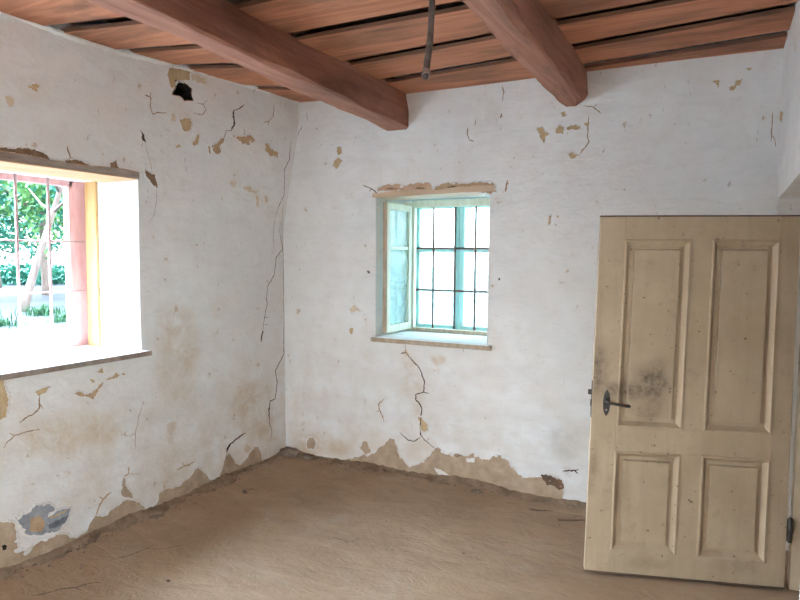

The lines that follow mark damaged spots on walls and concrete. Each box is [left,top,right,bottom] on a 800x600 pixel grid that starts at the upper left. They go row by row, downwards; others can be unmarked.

flaking render [166,64,208,102]
flaking render [170,112,279,159]
crack [578,104,600,156]
flaking render [375,180,497,195]
crack [261,128,302,341]
crack [5,395,43,446]
water stain [5,398,132,490]
flaking render [0,444,264,568]
water stain [147,290,210,449]
crack [268,331,284,436]
crack [401,350,436,450]
flaking render [324,436,566,499]